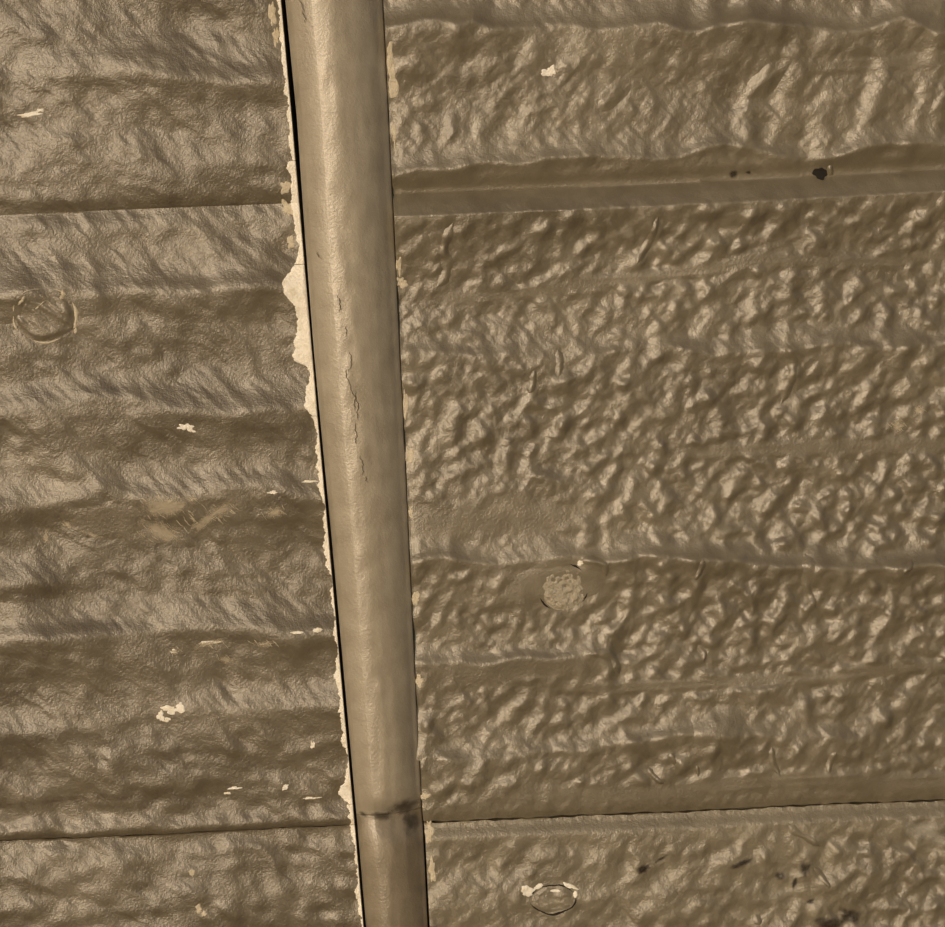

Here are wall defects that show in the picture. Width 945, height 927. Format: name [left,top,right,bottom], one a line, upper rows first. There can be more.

peeling [156,702,185,722]
peeling [268,0,364,927]
crack [281,0,368,927]